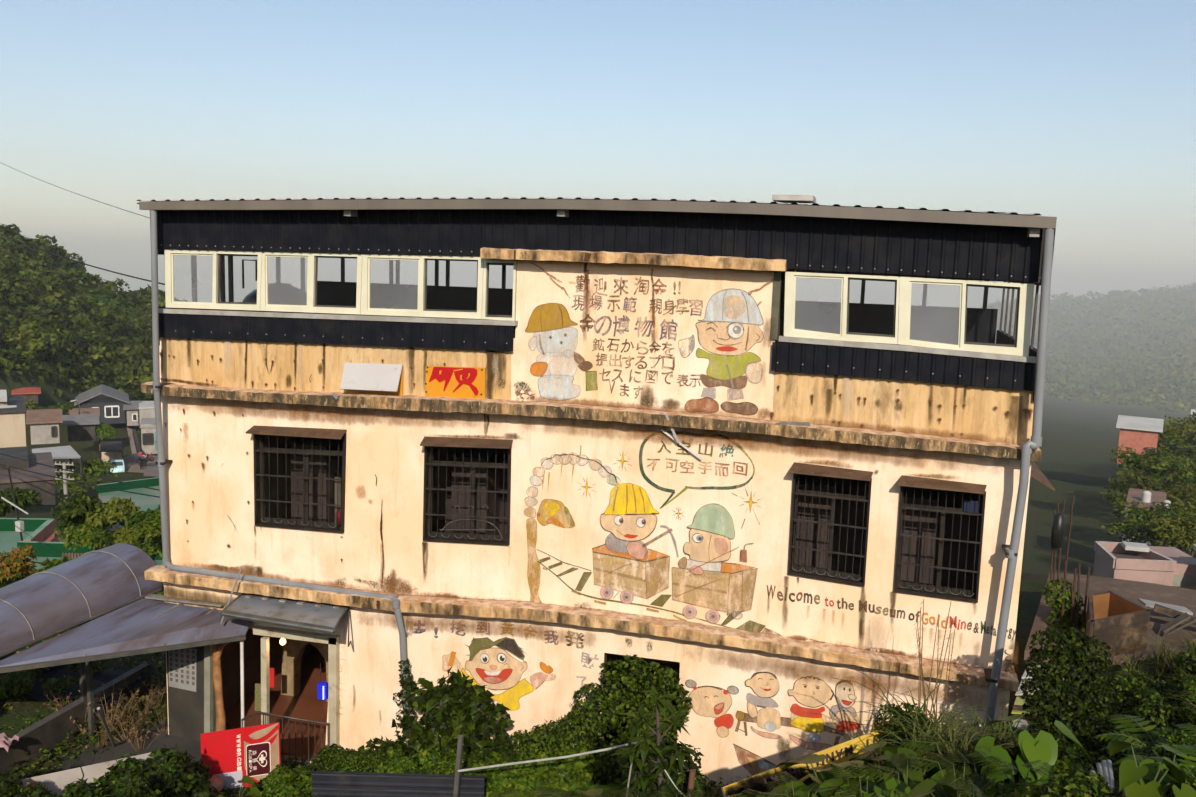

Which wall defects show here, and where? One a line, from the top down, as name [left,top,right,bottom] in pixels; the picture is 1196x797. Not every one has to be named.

crack [531,262,568,295]
water stain [160,338,212,382]
water stain [409,347,427,383]
water stain [811,375,866,425]
water stain [929,383,967,423]
crack [375,475,384,609]
water stain [369,573,412,595]